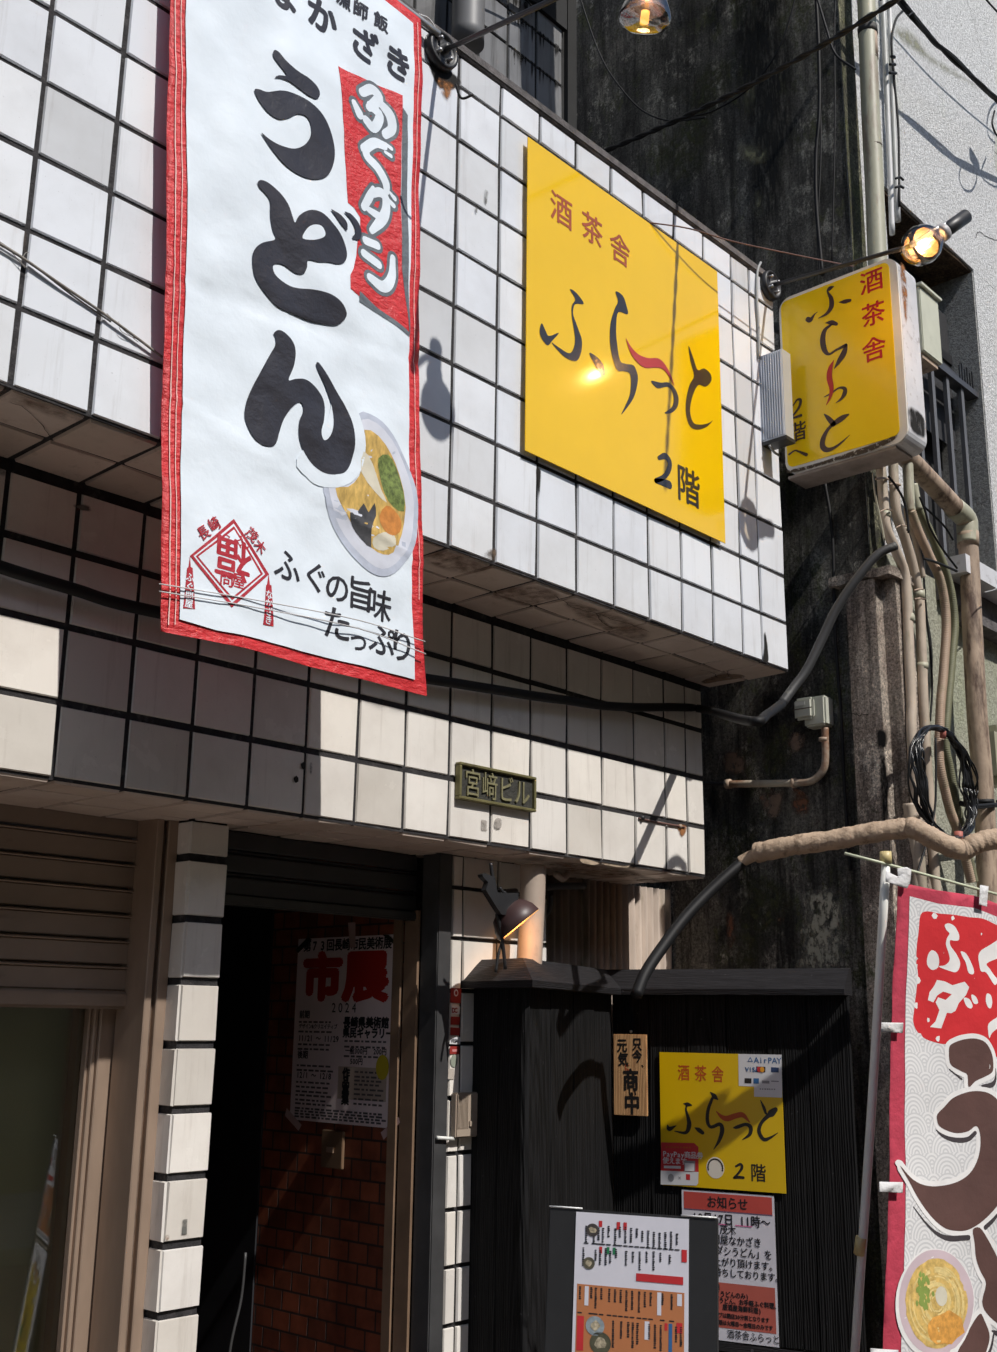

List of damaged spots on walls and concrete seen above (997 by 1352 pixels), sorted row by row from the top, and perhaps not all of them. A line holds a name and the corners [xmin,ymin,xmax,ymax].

leakage [738,0,792,229]
leakage [433,549,496,571]
leakage [800,893,840,968]